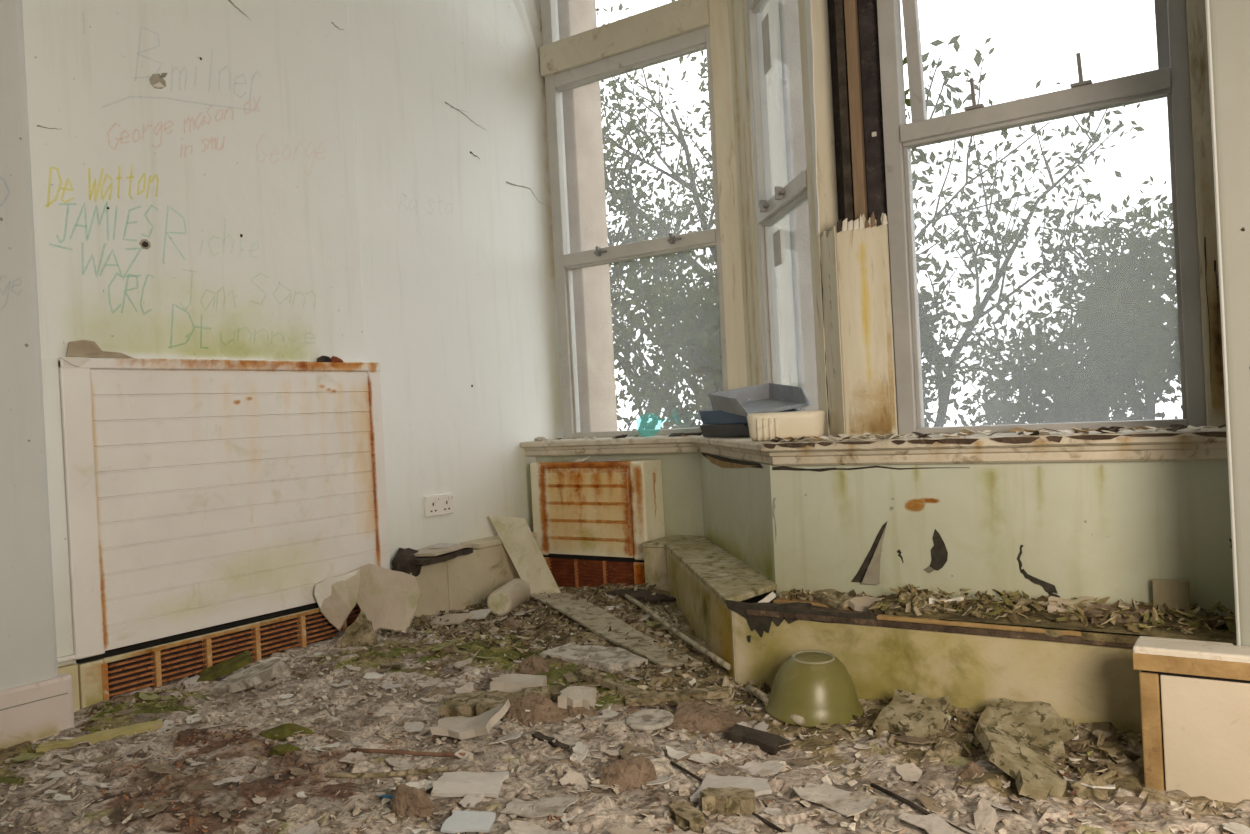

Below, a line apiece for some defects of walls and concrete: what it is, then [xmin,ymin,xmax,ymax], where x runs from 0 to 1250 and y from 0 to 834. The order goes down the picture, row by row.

rust [287,356,361,369]
peeling [763,424,1227,449]
rust [368,381,379,555]
rust [540,461,657,555]
peeling [851,498,894,585]
peeling [924,529,953,577]
crack [1017,545,1060,598]